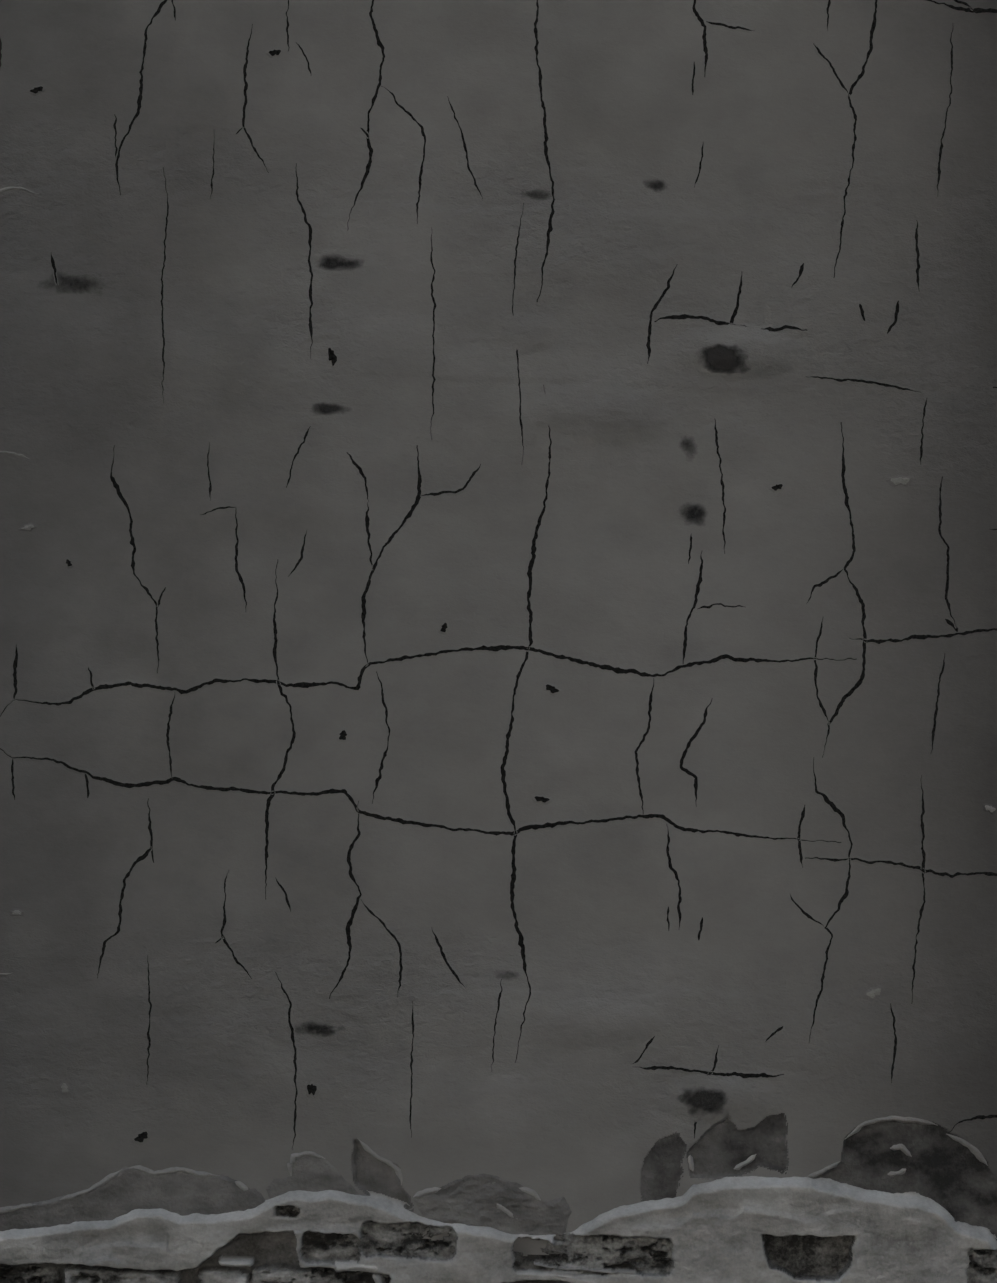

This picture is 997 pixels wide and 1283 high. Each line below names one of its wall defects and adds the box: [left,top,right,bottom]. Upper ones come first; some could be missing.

crack [111,0,178,196]
crack [208,0,315,359]
crack [345,0,439,440]
crack [509,0,557,316]
crack [689,0,755,95]
crack [644,263,808,364]
crack [789,0,880,289]
crack [0,418,997,1150]
spalling [130,1128,152,1145]
peeling [0,1138,572,1240]
peeling [640,1113,789,1201]
peeling [807,1115,997,1241]